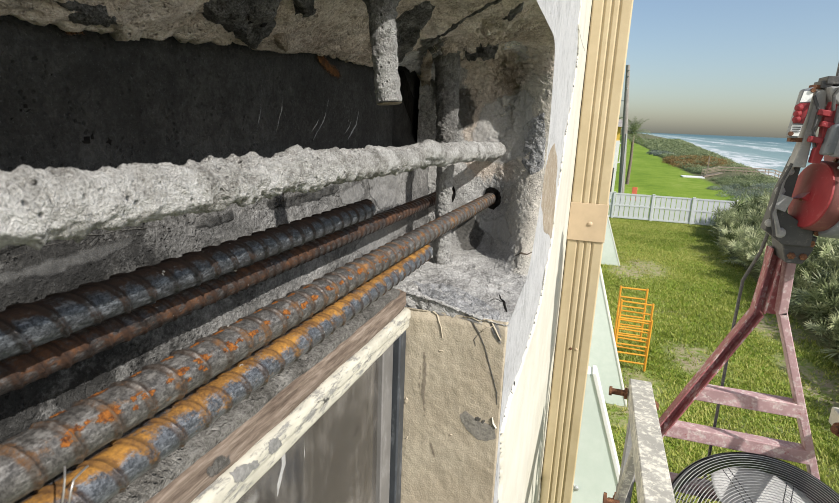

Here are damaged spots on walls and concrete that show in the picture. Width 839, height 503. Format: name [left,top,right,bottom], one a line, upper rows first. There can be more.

spalling [0,0,557,503]